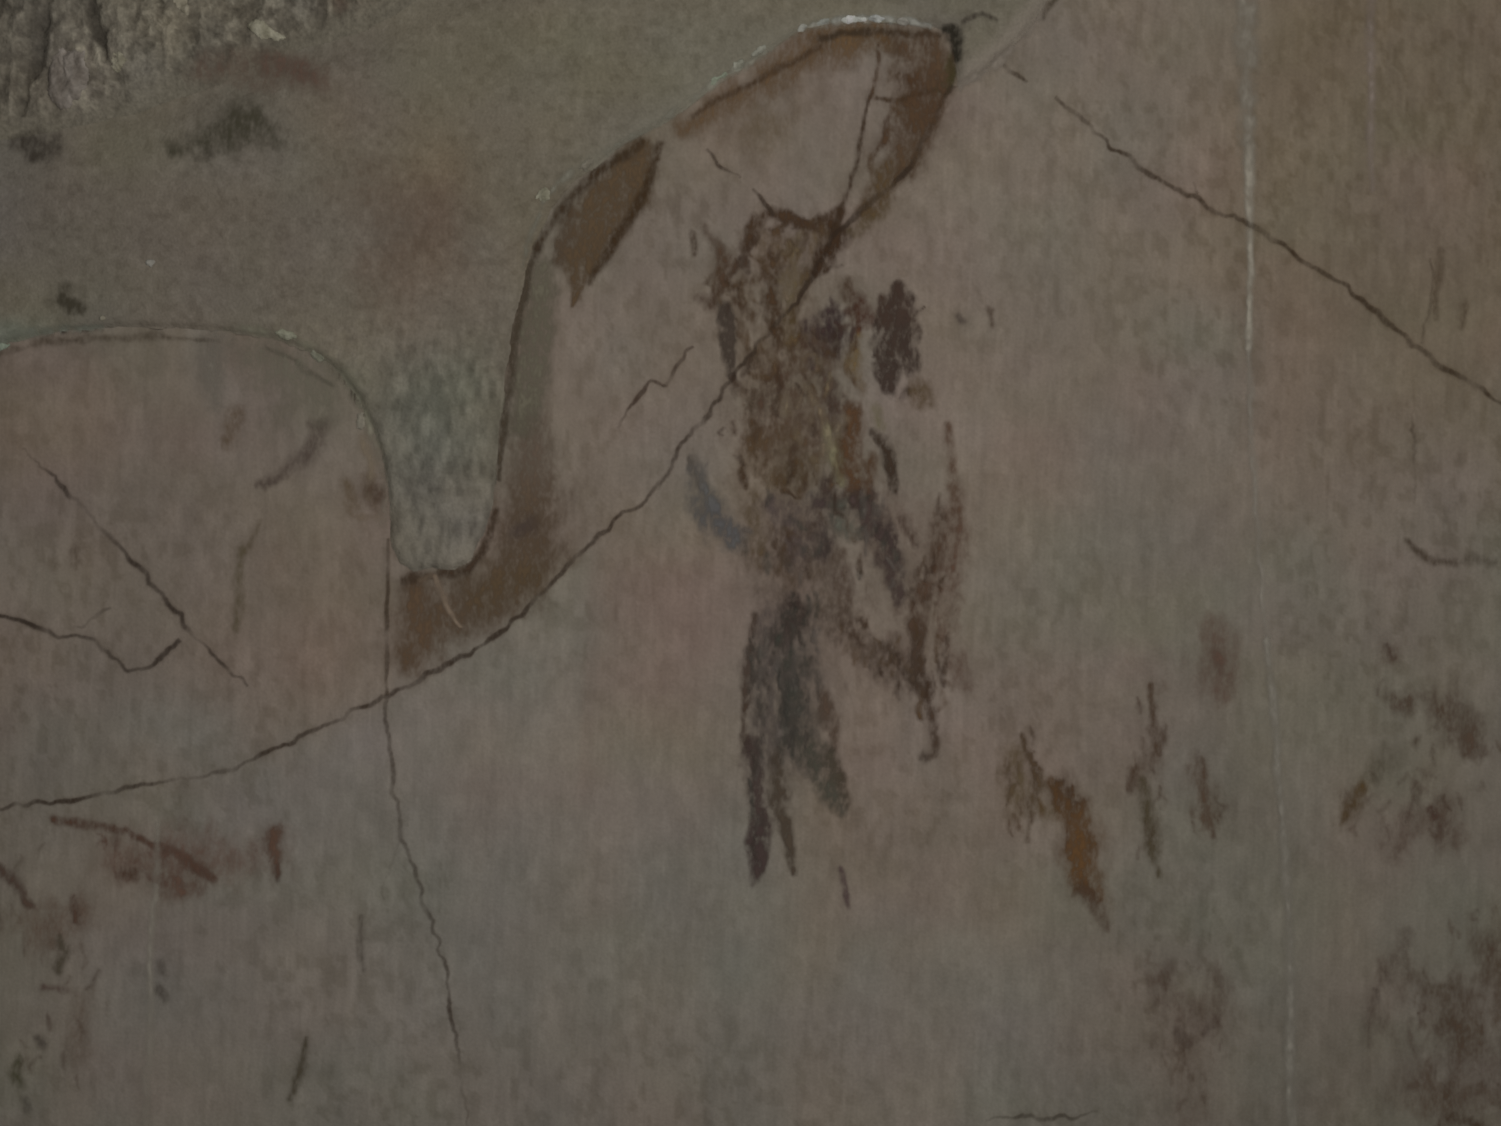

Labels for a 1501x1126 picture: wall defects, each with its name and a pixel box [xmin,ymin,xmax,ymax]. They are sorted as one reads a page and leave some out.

peeling [797,14,909,32]
flaking render [0,0,416,140]
crack [759,194,774,216]
crack [1108,145,1208,208]
crack [1280,241,1402,333]
crack [629,366,677,408]
crack [0,614,72,636]
crack [123,554,224,672]
crack [360,504,643,709]
crack [261,732,307,755]
crack [36,796,85,805]
rust [1006,734,1101,907]